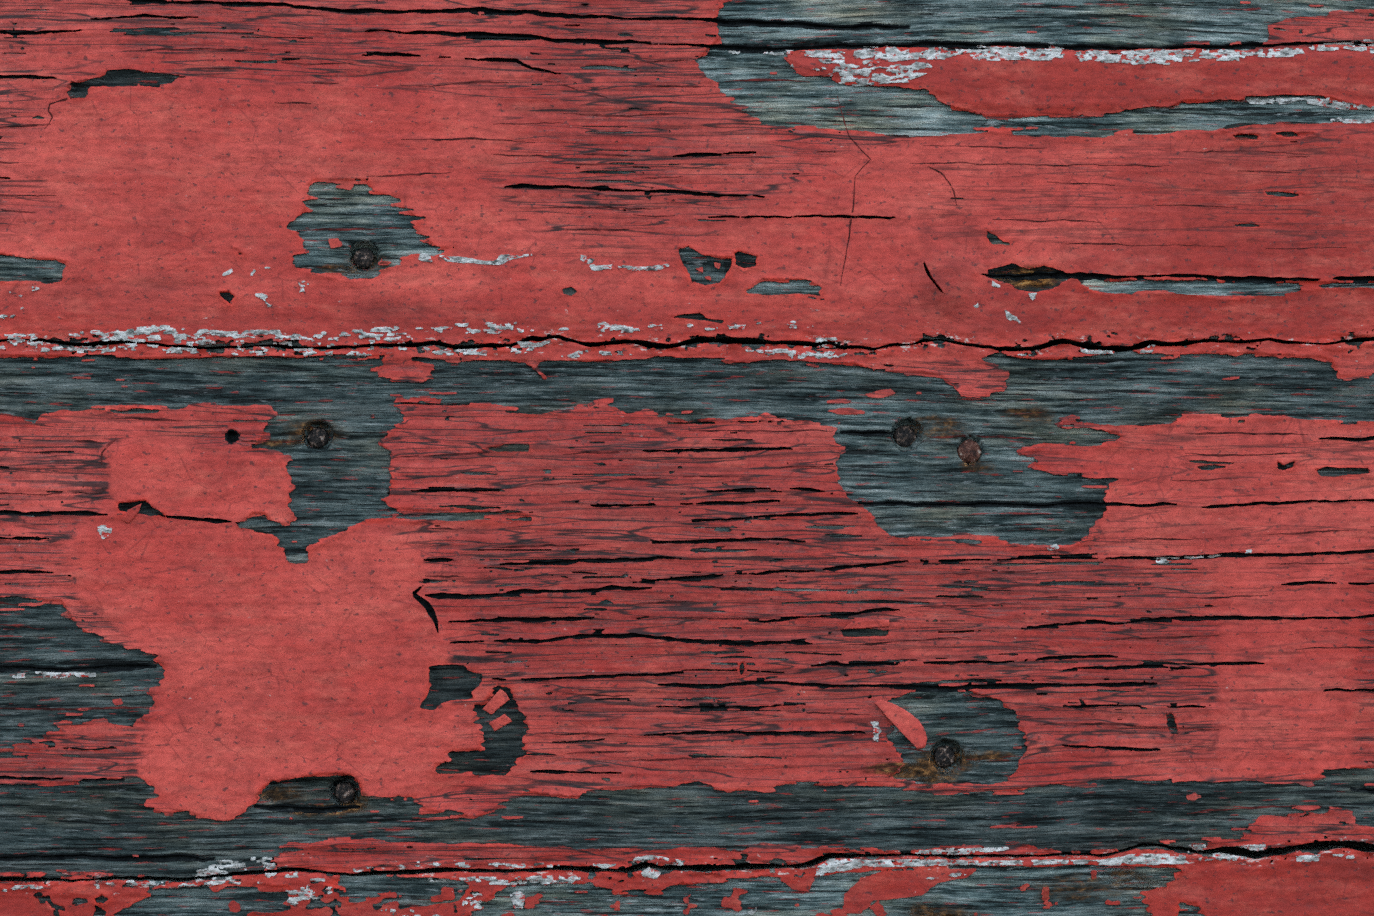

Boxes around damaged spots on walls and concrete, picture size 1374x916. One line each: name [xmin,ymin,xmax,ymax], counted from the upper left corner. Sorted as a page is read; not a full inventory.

peeling [67,69,186,99]
crack [0,0,1374,286]
peeling [695,0,1374,142]
peeling [287,179,532,292]
crack [923,263,942,292]
peeling [0,321,1374,564]
crack [389,429,1374,774]
peeling [0,596,165,755]
corrosion [260,787,367,816]
peeling [420,662,538,776]
peeling [0,680,1374,916]
corrosion [872,751,1010,782]